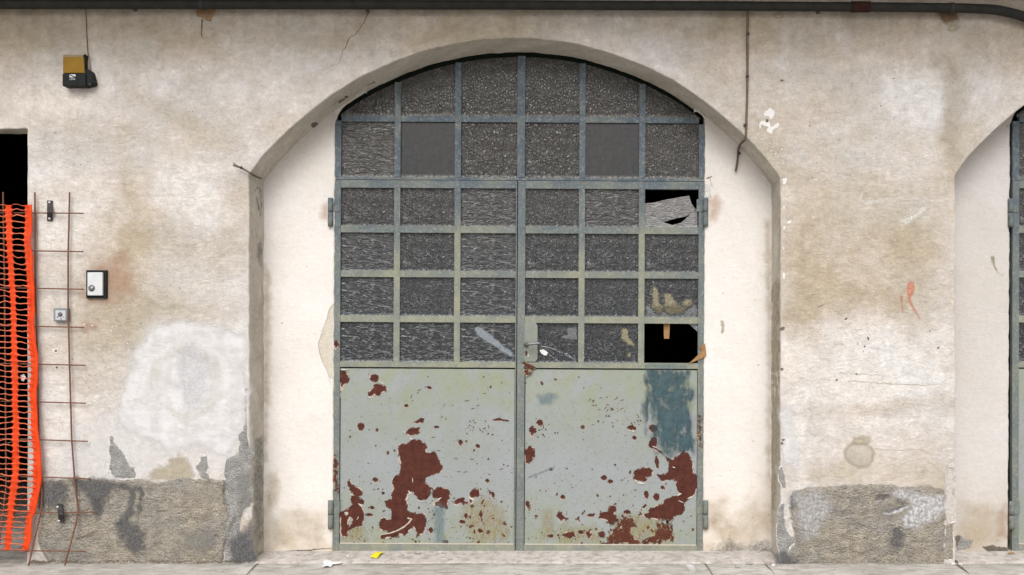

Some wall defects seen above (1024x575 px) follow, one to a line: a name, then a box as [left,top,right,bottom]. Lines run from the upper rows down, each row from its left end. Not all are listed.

rust [340,369,350,397]
rust [368,374,388,398]
flaking render [108,436,136,479]
leakage [152,458,192,479]
flaking render [195,455,210,479]
flaking render [224,423,257,563]
rust [333,418,502,543]
rust [546,413,703,546]
flaking render [775,458,797,564]